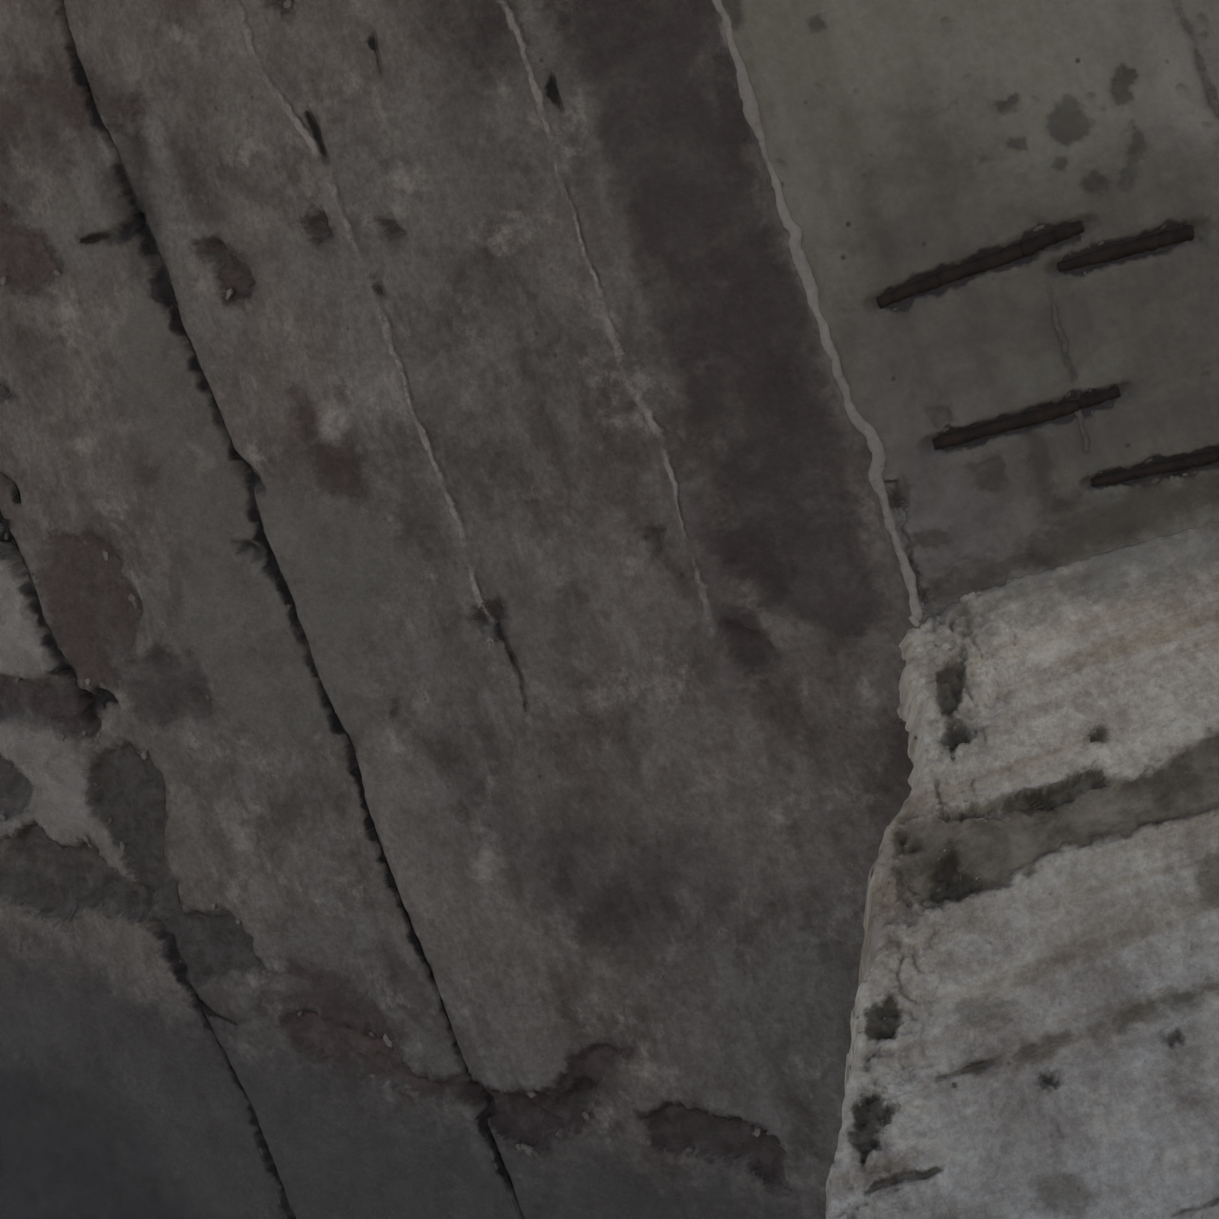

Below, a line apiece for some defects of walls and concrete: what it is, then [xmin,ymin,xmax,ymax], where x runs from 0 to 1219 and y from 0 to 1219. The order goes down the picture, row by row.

crack [65,20,107,129]
crack [304,110,326,156]
crack [366,36,380,69]
crack [545,74,561,109]
spalling [876,219,1195,312]
spalling [932,385,1121,452]
spalling [1091,445,1219,489]
crack [0,485,117,715]
crack [80,164,518,1219]
crack [495,622,526,711]
water stain [0,955,738,1219]
crack [868,1167,941,1193]